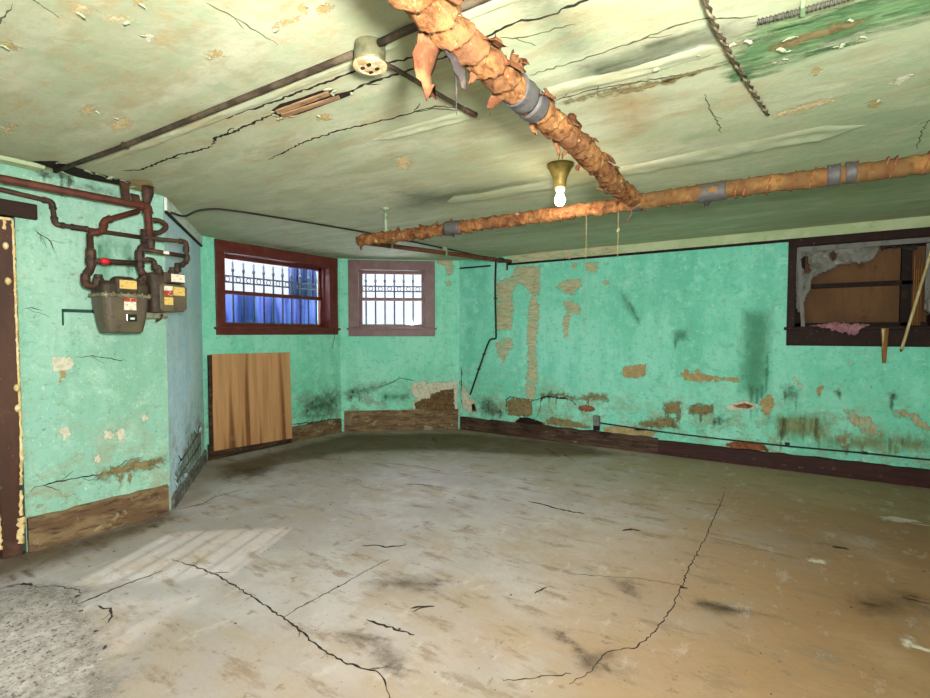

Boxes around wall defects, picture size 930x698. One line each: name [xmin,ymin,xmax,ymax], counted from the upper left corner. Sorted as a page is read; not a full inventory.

crack [486,0,588,45]
crack [533,15,758,75]
damp [564,0,930,104]
crack [125,56,414,171]
spalling [270,88,354,121]
crack [269,103,458,160]
peeling [495,246,617,428]
peeling [621,363,647,379]
peeling [678,368,739,383]
damp [747,316,765,403]
peeling [726,394,775,419]
crack [3,559,390,698]